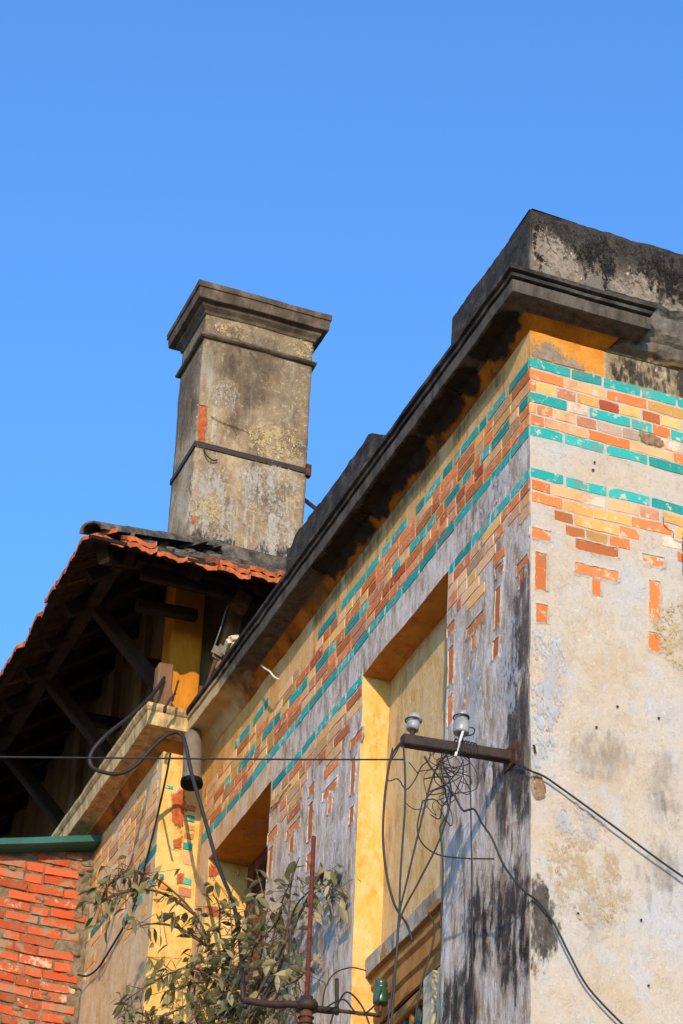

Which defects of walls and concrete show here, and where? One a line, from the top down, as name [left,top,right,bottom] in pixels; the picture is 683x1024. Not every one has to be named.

leakage [531,214,683,304]
peeling [531,338,595,378]
leakage [611,354,683,396]
peeling [186,423,300,557]
leakage [289,311,520,602]
peeling [653,600,683,669]
leakage [507,559,530,820]
spalling [169,787,187,851]
leakage [439,831,561,1024]